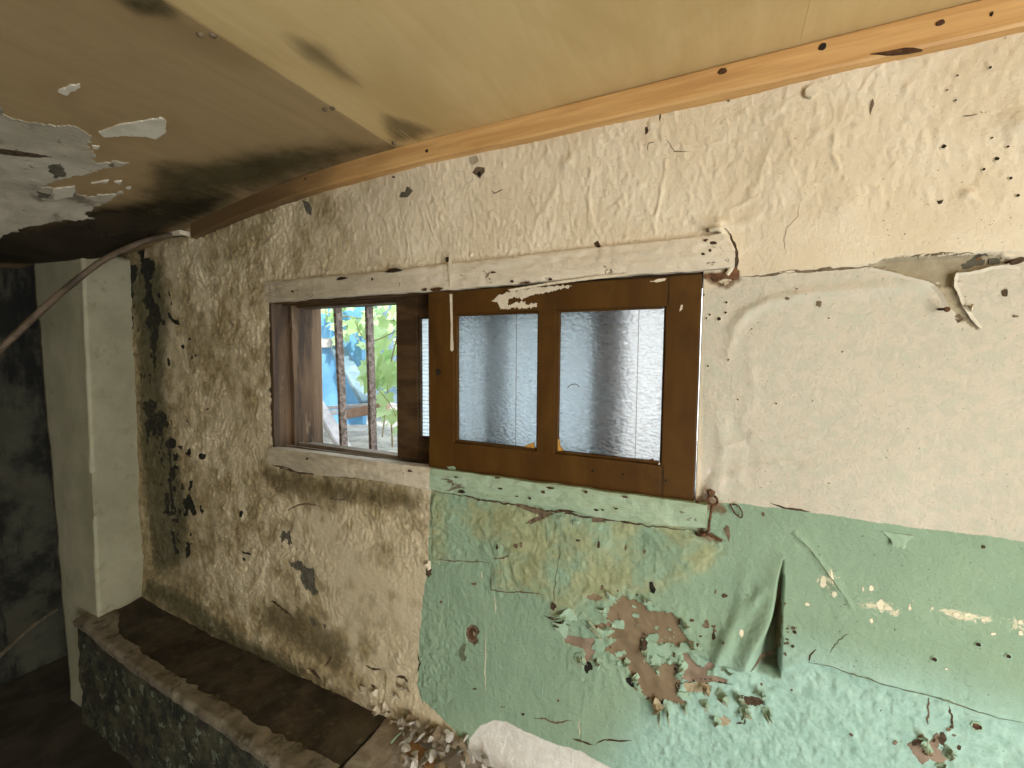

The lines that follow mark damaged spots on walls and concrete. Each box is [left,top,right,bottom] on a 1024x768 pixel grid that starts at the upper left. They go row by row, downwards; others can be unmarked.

peeling [58,83,80,96]
peeling [0,106,166,237]
peeling [492,274,628,310]
flaking render [868,253,1021,329]
water stain [0,151,342,568]
water stain [265,470,416,505]
rust [697,494,726,513]
flaking render [288,560,318,596]
peeling [820,570,837,598]
peeling [862,585,893,623]
flaking render [564,585,773,729]
flaking render [893,725,961,768]